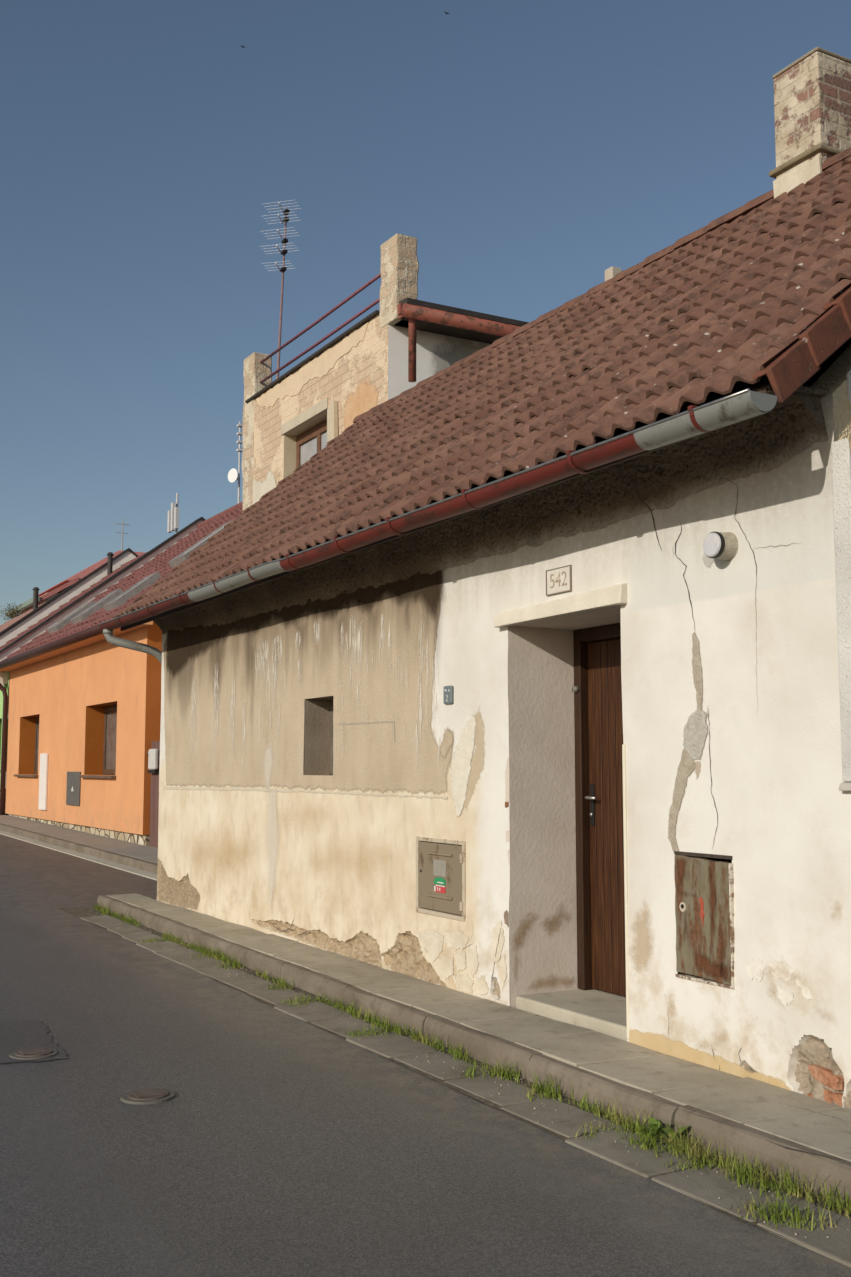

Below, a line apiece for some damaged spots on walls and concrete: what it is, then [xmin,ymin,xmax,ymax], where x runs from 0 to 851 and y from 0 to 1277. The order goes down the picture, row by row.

peeling [256,322,369,409]
flaking render [343,381,379,430]
crack [625,461,695,628]
water stain [167,570,442,760]
peeling [164,572,484,817]
spalling [158,861,200,910]
peeling [256,910,509,998]
rust [677,859,687,895]
rust [697,868,728,980]
spalling [795,1035,851,1109]